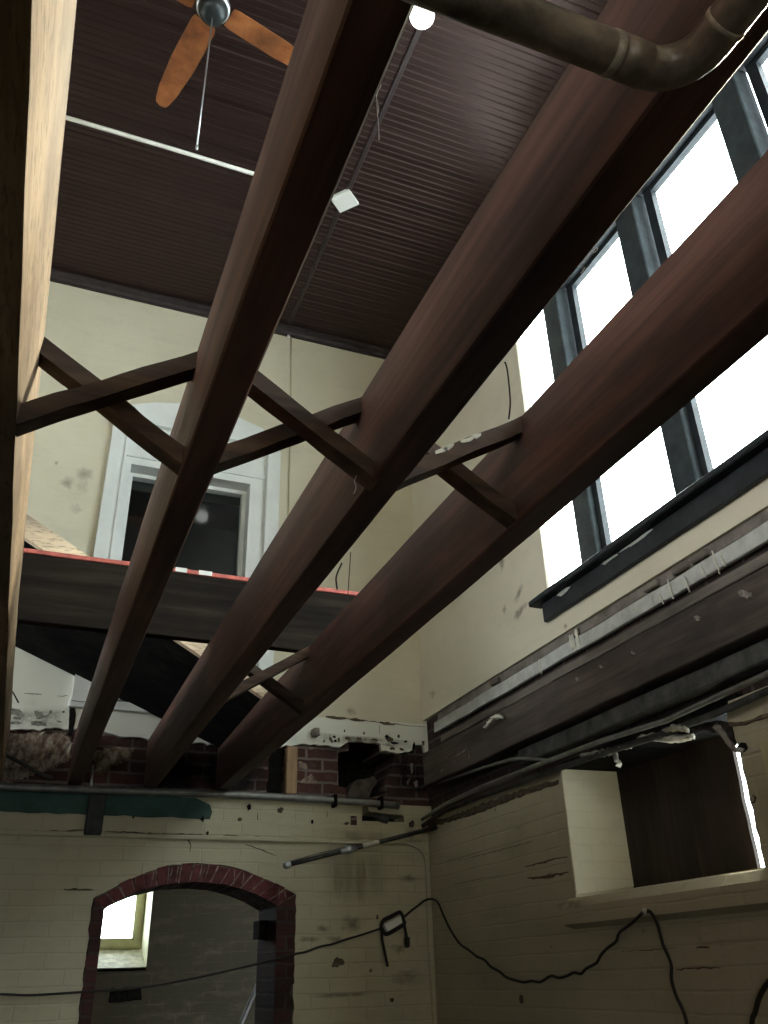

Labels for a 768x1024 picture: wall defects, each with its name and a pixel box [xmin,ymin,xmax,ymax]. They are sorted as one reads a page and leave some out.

spalling [0,708,74,783]
spalling [310,730,425,799]
crack [456,841,568,884]